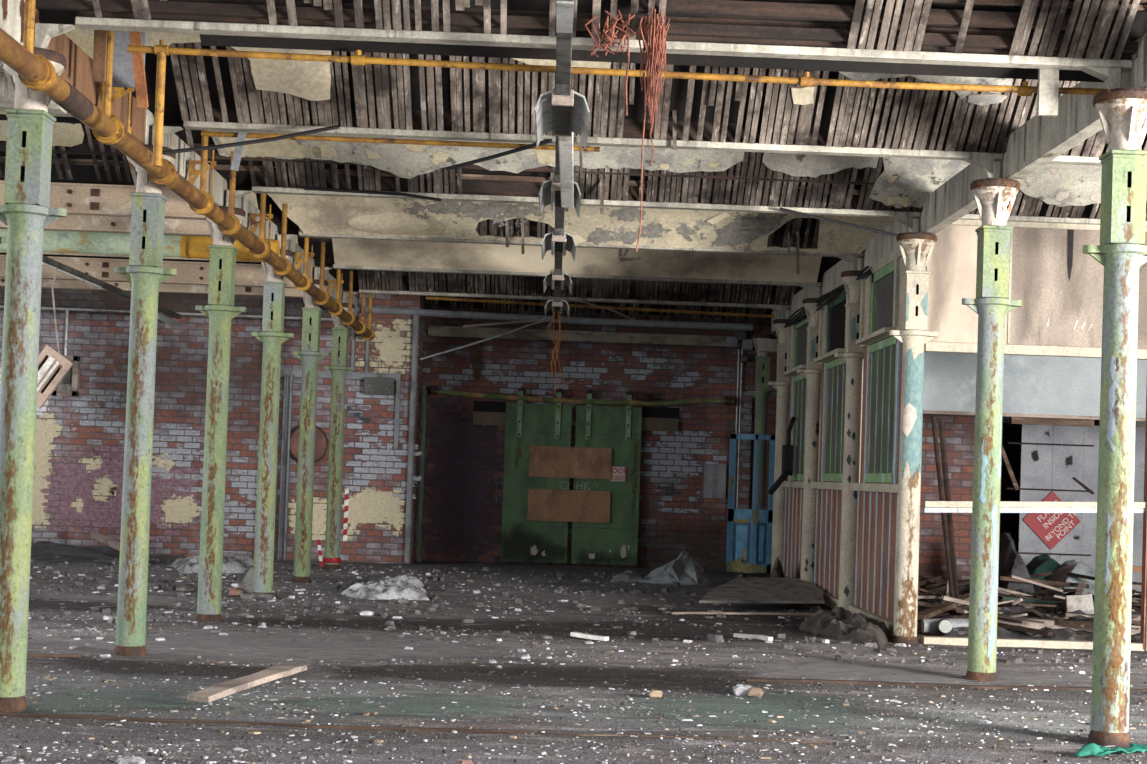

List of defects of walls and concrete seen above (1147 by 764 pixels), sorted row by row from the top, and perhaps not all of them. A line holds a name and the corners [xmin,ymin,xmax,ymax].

peeling [232,47,331,101]
peeling [212,131,555,179]
peeling [268,152,970,254]
peeling [573,145,744,173]
peeling [1019,164,1102,207]
corrosion [0,254,29,683]
corrosion [123,300,149,634]
corrosion [204,333,224,601]
corrosion [258,358,274,583]
peeling [902,349,924,480]
corrosion [981,322,998,674]
corrosion [1102,415,1130,735]